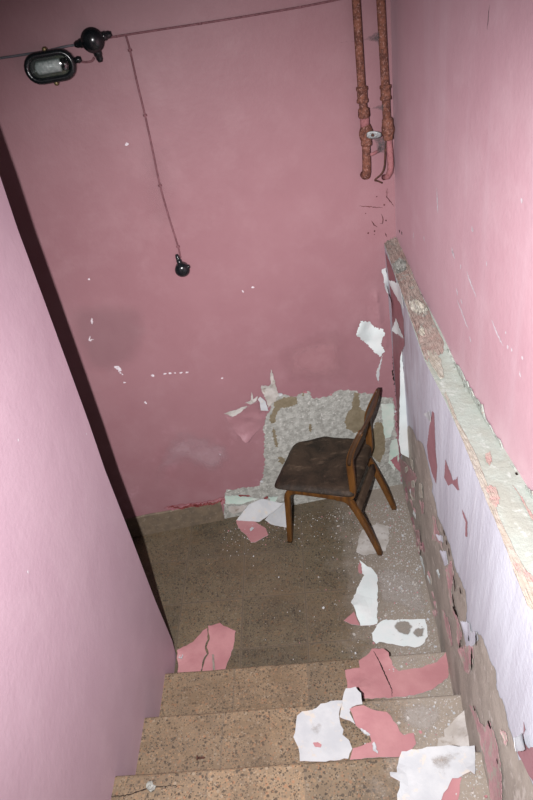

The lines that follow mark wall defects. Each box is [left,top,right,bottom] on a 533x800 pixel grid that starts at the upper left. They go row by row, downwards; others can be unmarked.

peeling [166,232,533,800]